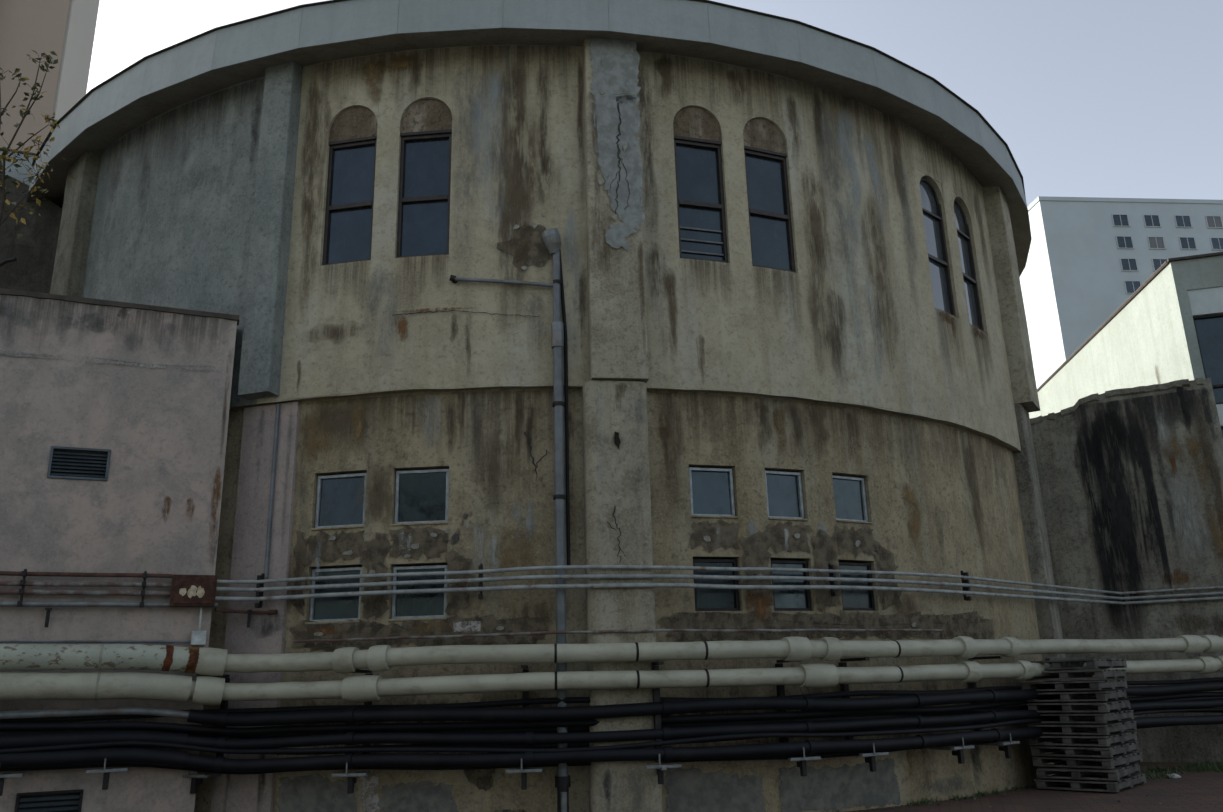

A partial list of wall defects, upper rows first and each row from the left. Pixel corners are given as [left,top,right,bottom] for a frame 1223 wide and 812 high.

damp [499,45,548,272]
peeling [589,38,646,250]
crack [610,103,630,214]
corrosion [393,308,504,351]
spalling [497,213,551,270]
damp [639,246,677,343]
damp [803,178,843,362]
corrosion [211,471,221,532]
crack [524,431,547,481]
damp [1076,387,1212,624]
spalling [289,513,550,652]
spalling [658,520,995,642]